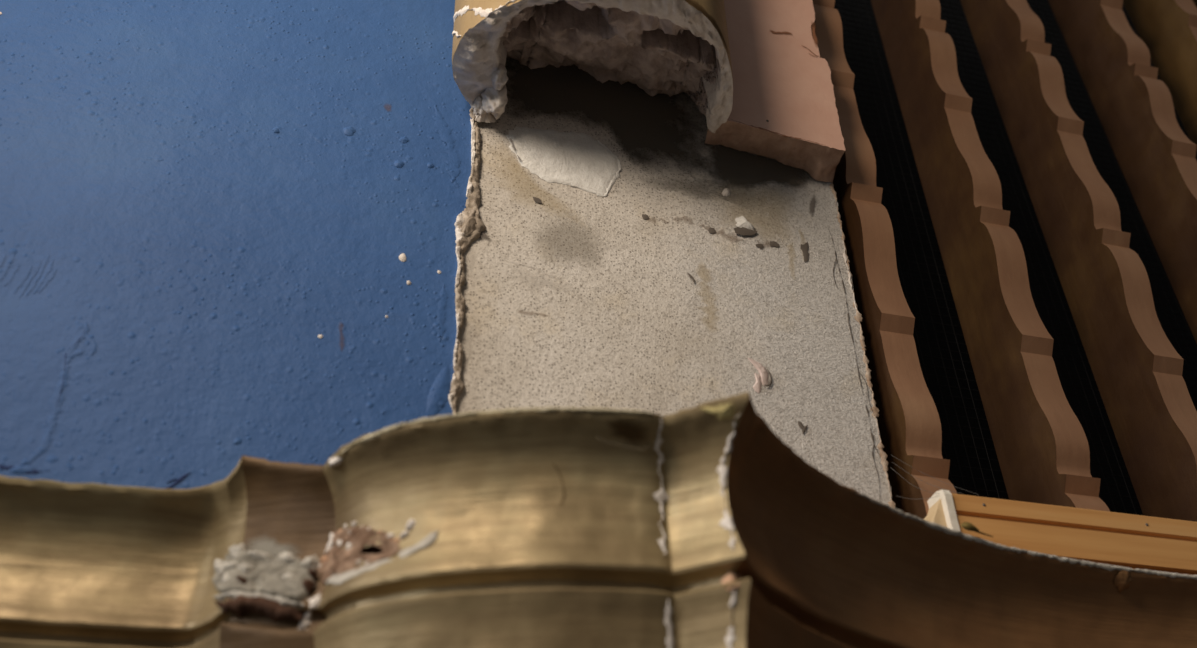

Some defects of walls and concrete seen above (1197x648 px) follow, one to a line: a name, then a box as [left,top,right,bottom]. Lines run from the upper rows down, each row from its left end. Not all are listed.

flaking render [452,0,823,145]
spalling [506,126,622,197]
spalling [734,216,757,235]
spalling [212,519,438,631]